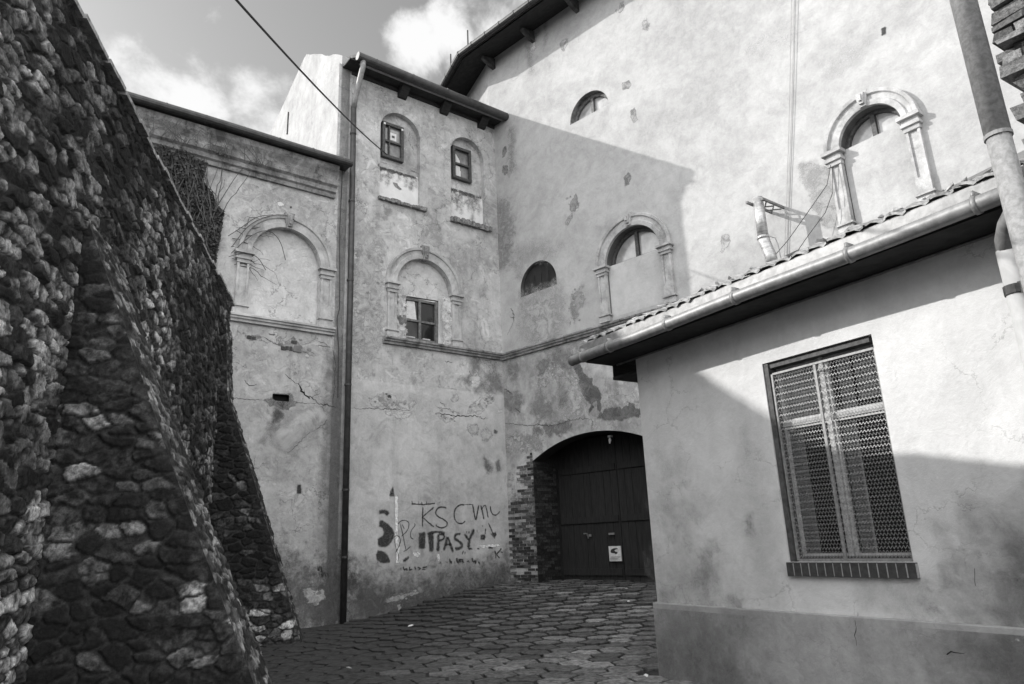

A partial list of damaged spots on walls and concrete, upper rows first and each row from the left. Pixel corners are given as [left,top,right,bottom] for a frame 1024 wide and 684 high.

spalling [565,194,579,225]
peeling [569,286,585,324]
spalling [247,334,327,357]
crack [285,343,336,453]
spalling [355,392,416,420]
peeling [435,359,543,453]
spalling [296,588,325,615]